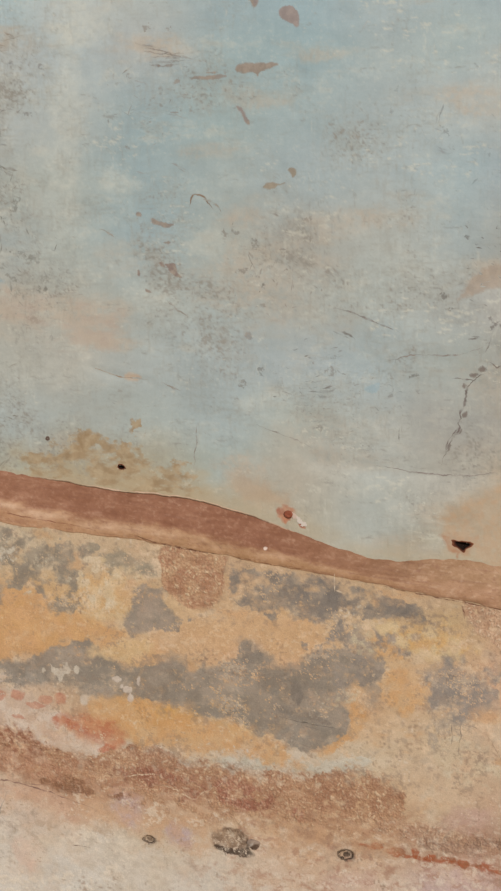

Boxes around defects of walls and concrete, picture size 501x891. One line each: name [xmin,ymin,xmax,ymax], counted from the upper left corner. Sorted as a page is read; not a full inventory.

peeling [278,5,300,28]
crack [377,340,501,477]
peeling [0,524,501,862]
corrosion [402,850,480,870]